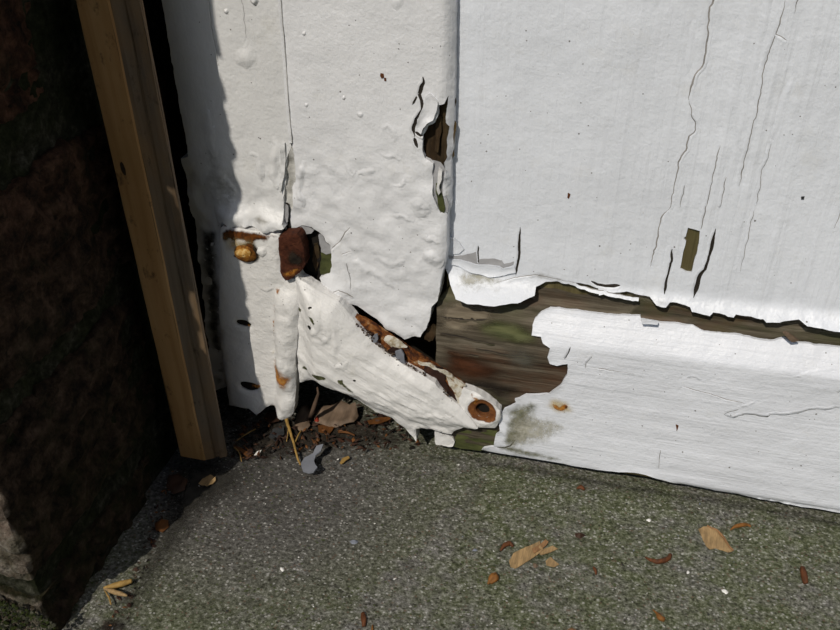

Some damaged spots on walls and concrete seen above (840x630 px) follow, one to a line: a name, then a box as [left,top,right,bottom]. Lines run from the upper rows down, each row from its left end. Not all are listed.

peeling [416,93,438,134]
crack [650,0,718,294]
crack [691,0,798,298]
peeling [432,160,449,213]
corrosion [223,230,269,262]
crack [493,227,639,301]
peeling [680,228,700,271]
corrosion [423,365,457,401]
corrosion [468,398,496,423]
crack [682,386,840,418]
peeling [434,430,498,451]
water stain [506,420,556,456]